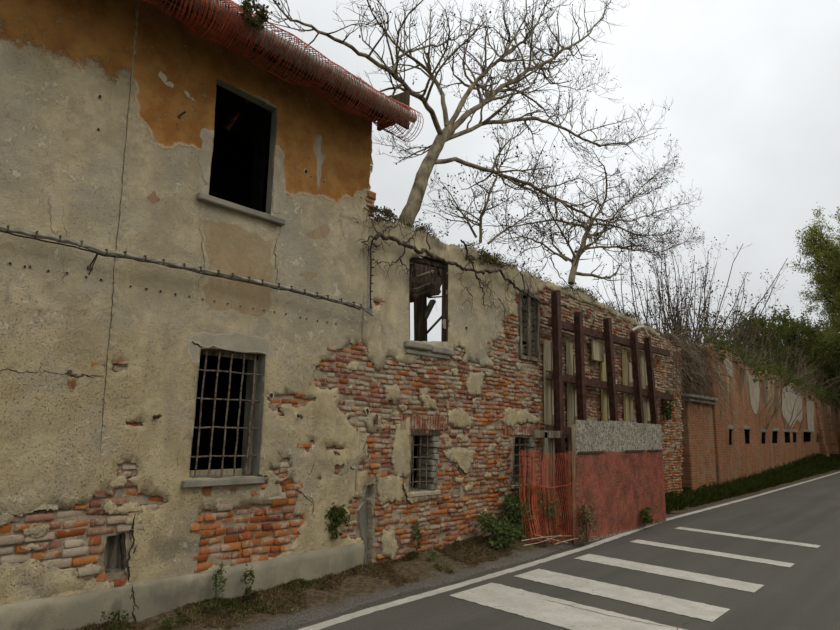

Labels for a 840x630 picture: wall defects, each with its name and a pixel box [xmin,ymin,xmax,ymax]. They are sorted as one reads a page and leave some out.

peeling [129,0,376,217]
crack [0,0,140,462]
flaking render [267,392,315,418]
flaking render [297,440,314,452]
flaking render [309,288,684,563]
flaking render [0,462,168,587]
crack [126,513,139,621]
flaking render [190,458,309,572]